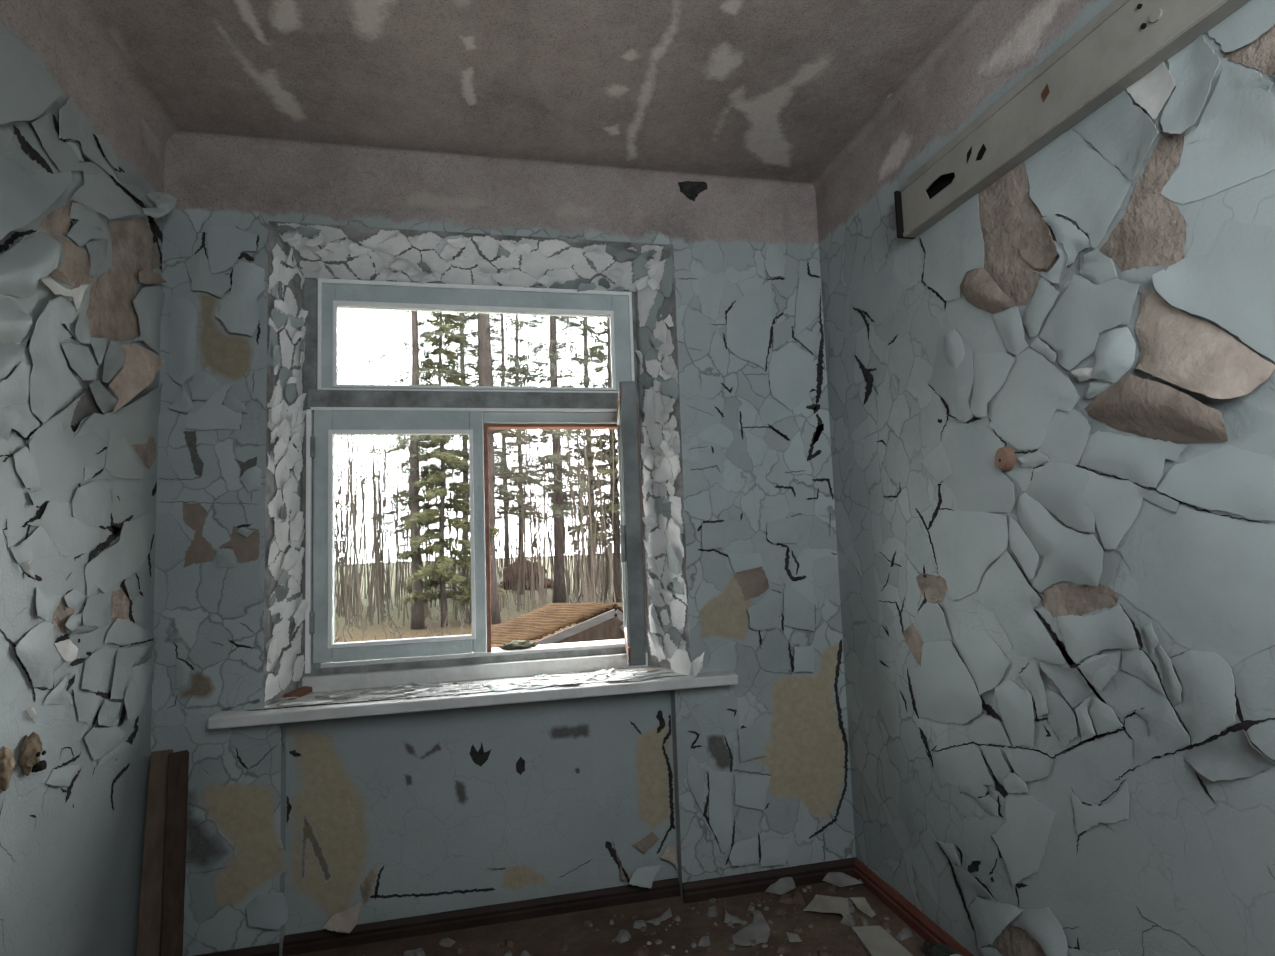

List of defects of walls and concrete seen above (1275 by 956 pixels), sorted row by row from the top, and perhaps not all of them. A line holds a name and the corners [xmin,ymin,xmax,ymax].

peeling [208,15,309,123]
peeling [232,0,307,47]
peeling [342,0,403,43]
peeling [0,34,708,786]
crack [852,307,898,404]
peeling [903,0,1275,886]
crack [1076,465,1269,524]
crack [689,261,848,862]
crack [236,681,610,778]
crack [630,709,770,865]
crack [879,481,1275,931]
peeling [936,840,1121,956]